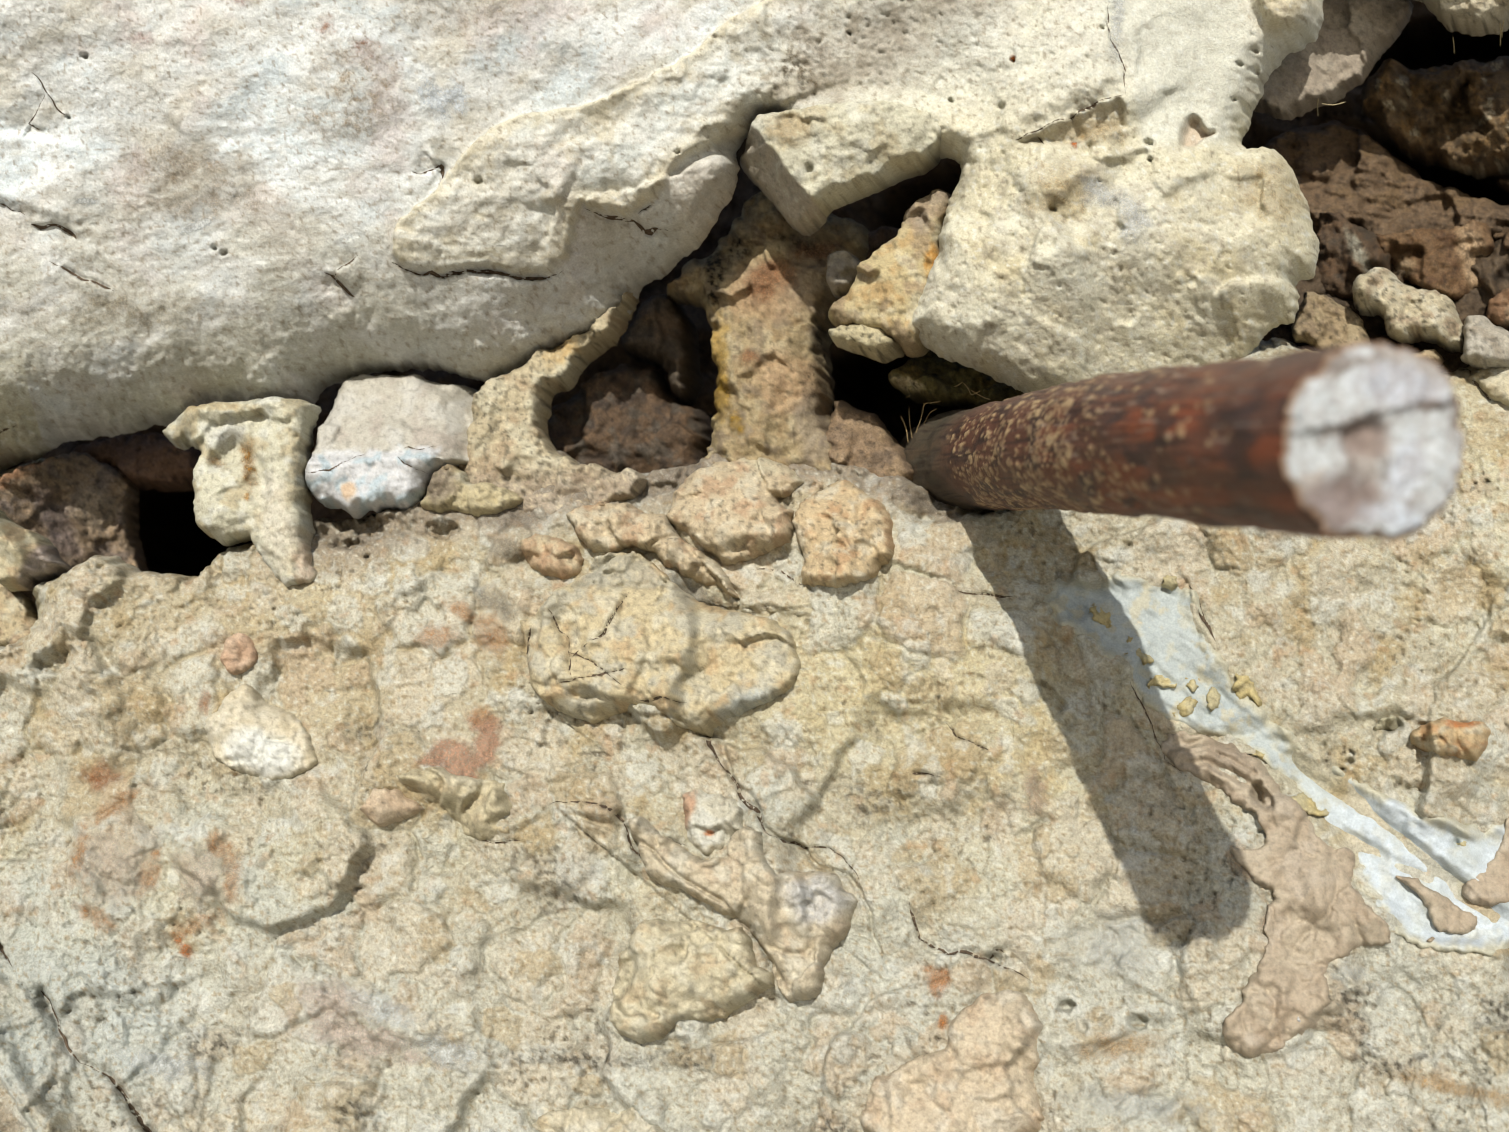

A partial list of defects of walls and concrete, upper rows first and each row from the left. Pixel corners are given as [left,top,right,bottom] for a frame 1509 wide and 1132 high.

crack [527,592,686,703]
crack [959,590,1012,598]
crack [1189,586,1215,640]
crack [1130,682,1186,776]
crack [553,801,640,856]
crack [706,736,860,884]
crack [909,904,1028,979]
crack [41,991,152,1132]